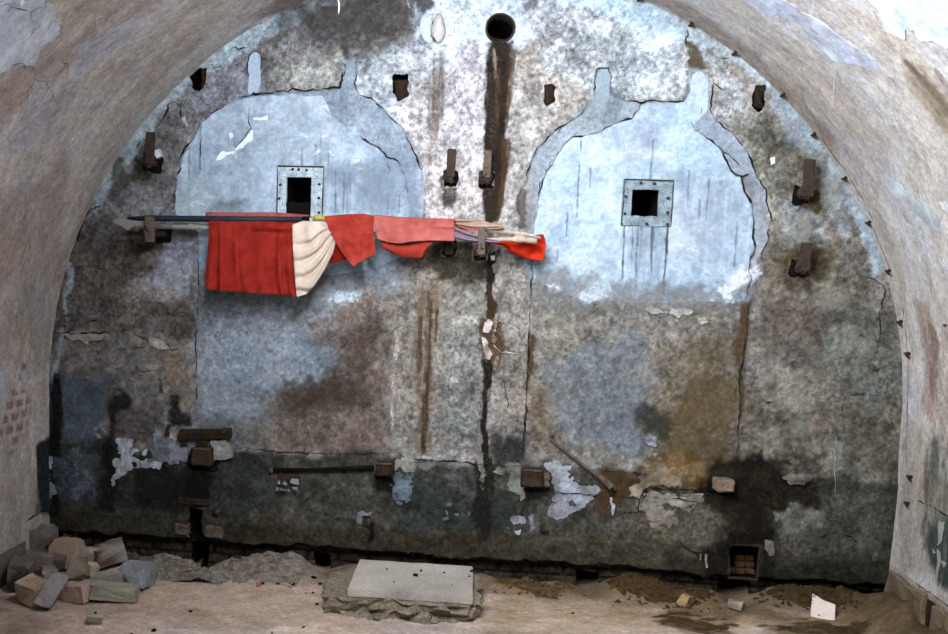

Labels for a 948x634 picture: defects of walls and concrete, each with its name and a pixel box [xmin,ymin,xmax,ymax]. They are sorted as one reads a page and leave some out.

peeling [0,0,62,73]
crack [136,38,422,206]
corrosion [483,39,515,223]
corrosion [516,189,527,229]
crack [523,58,785,457]
peeling [111,438,163,486]
leakage [283,325,376,411]
corrosion [416,242,506,464]
crack [414,259,533,467]
peeling [544,460,601,520]
leakage [695,428,821,582]
leakage [761,359,814,434]